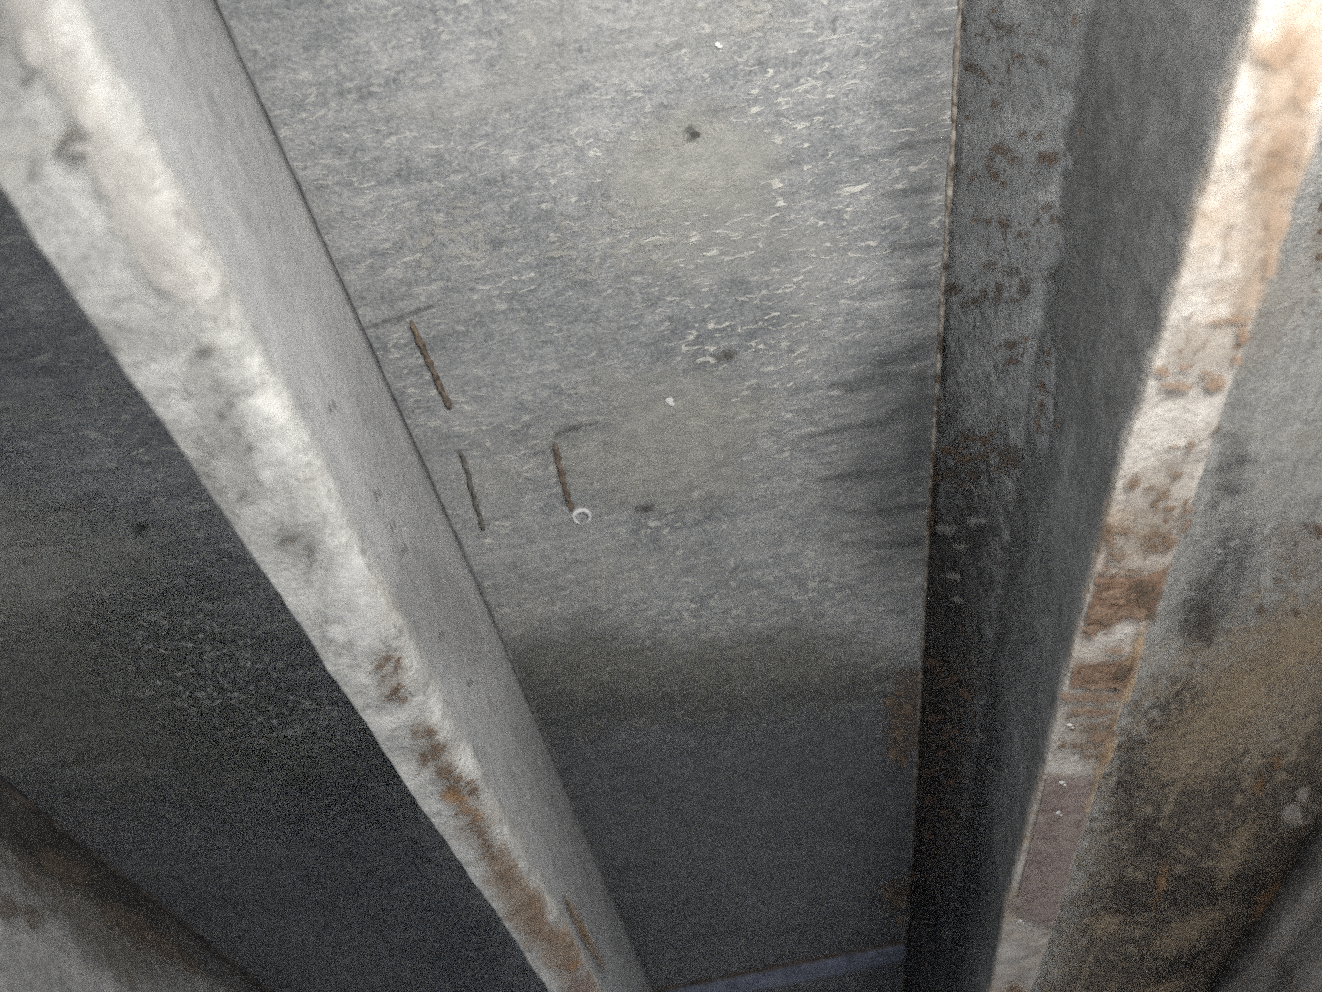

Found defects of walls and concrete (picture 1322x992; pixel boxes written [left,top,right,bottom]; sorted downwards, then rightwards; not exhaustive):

rust [941,0,1084,311]
rust [927,324,1019,535]
rust [989,334,1060,451]
rust [363,649,409,704]
rust [1005,436,1322,992]
rust [410,724,602,992]